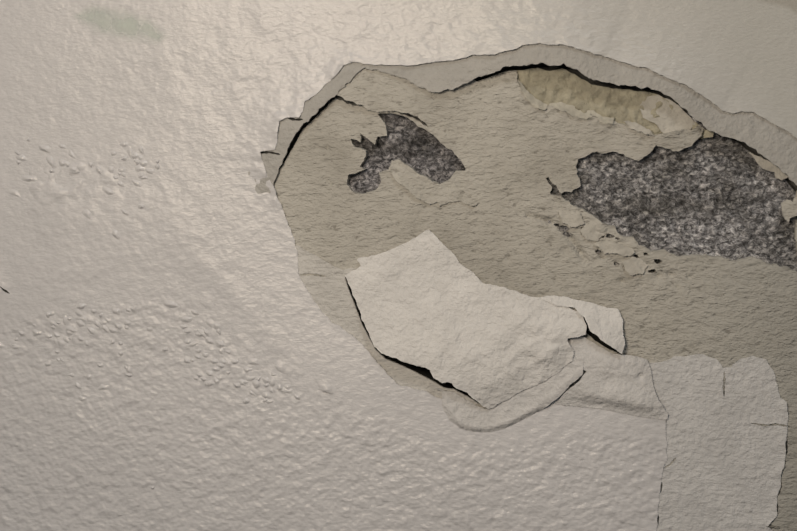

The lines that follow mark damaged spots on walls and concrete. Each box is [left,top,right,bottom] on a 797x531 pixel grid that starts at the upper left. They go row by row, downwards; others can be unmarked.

peeling [248,43,797,531]